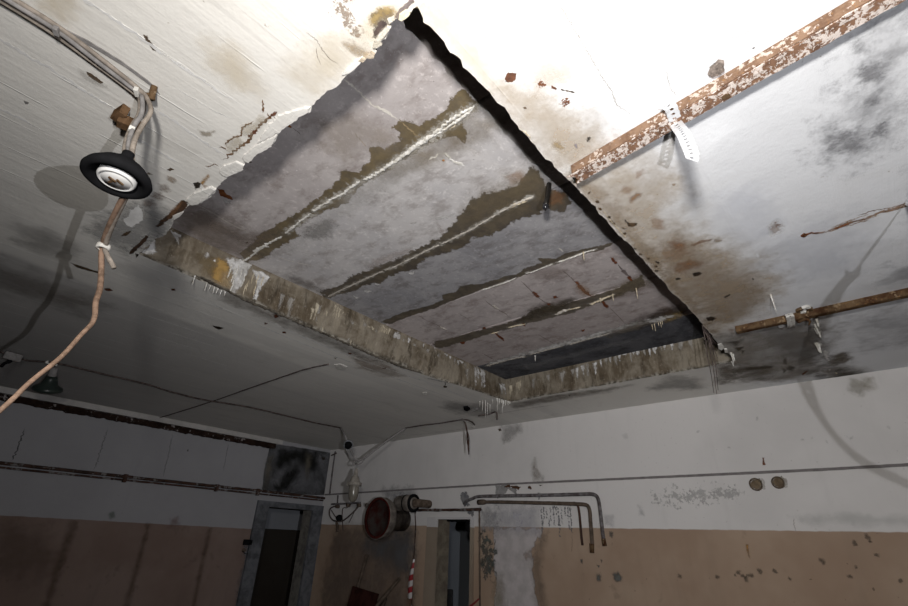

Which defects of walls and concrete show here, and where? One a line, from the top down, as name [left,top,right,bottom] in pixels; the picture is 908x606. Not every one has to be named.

spalling [342,0,414,75]
crack [306,32,420,137]
crack [181,91,277,167]
peeling [219,106,311,177]
peeling [88,176,217,254]
water stain [310,166,572,320]
rust [801,203,906,237]
spalling [196,275,424,374]
water stain [367,212,753,387]
water stain [480,515,497,581]